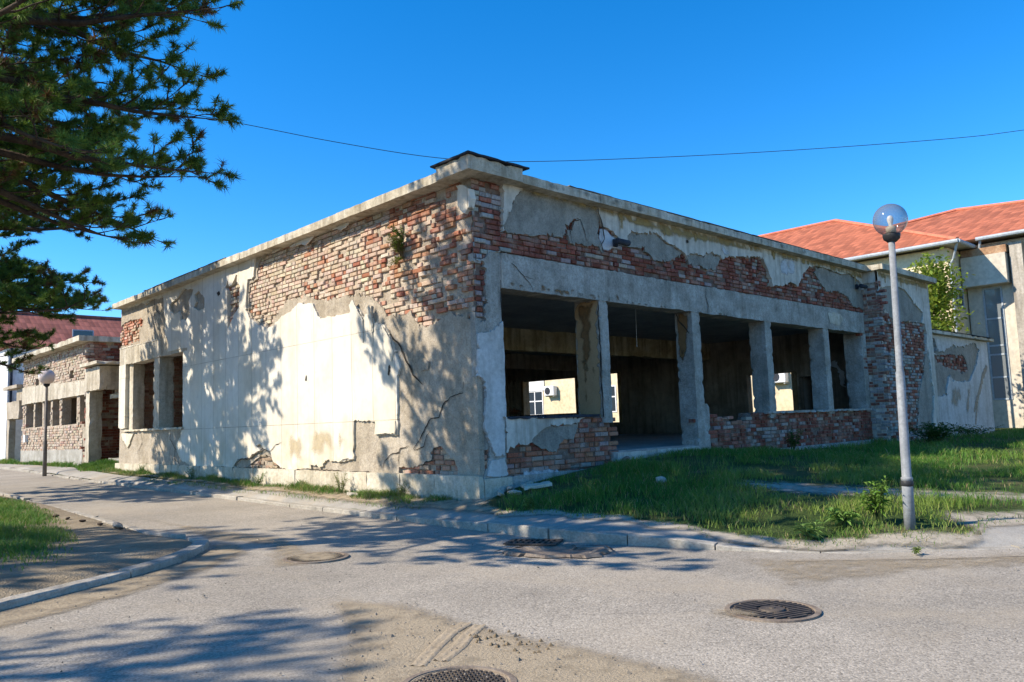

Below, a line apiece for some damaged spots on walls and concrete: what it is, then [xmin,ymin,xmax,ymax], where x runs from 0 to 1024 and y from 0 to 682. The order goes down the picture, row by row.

crack [570,209,605,246]
flaking render [120,289,205,348]
crack [388,329,422,384]
flaking render [217,177,978,477]
crack [219,382,464,472]